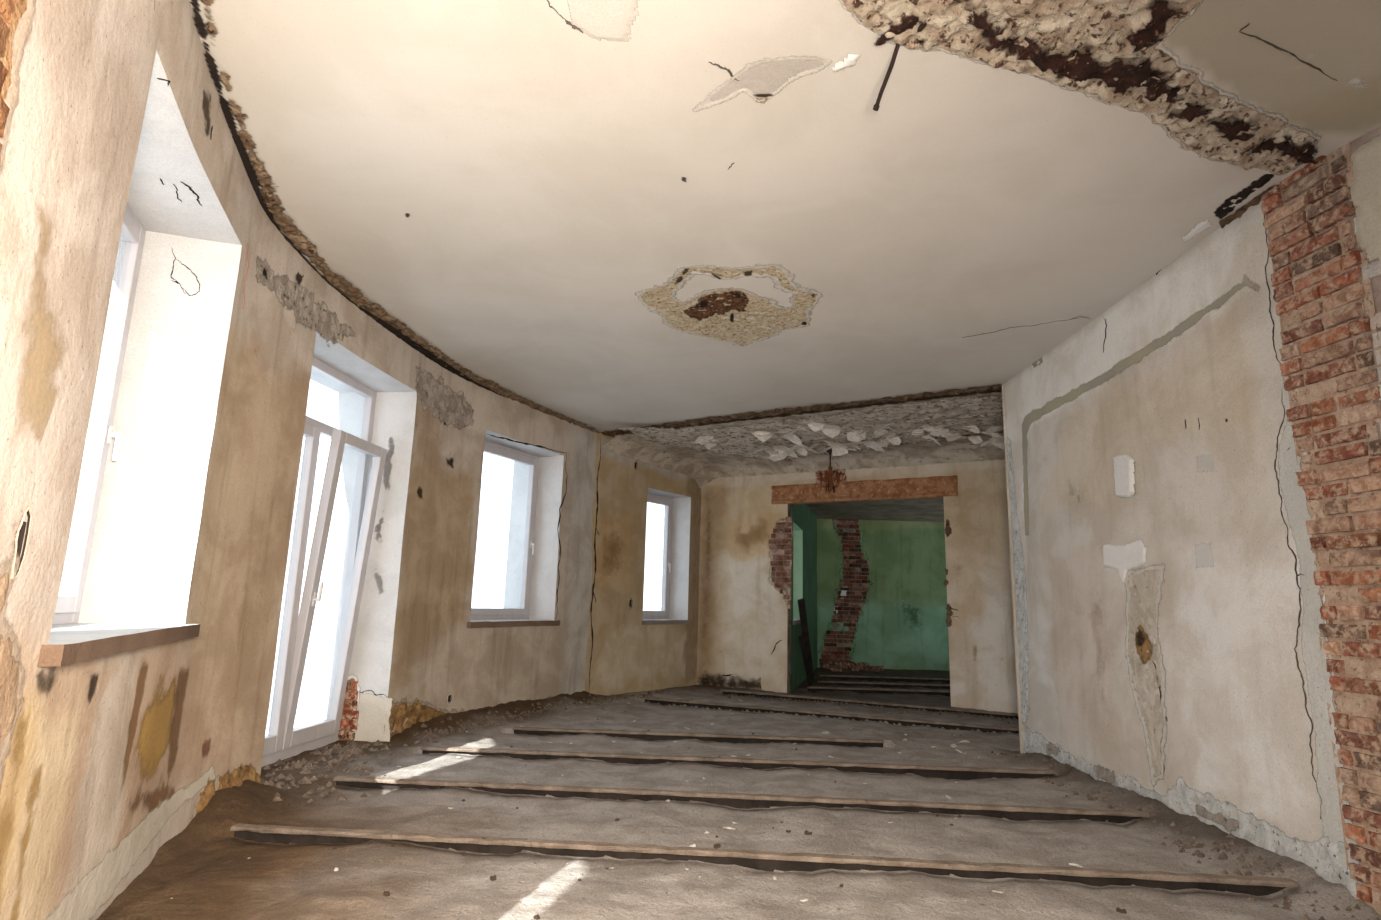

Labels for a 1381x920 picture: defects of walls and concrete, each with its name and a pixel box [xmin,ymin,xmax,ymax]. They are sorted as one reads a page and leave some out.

flaking render [0,0,36,171]
peeling [693,54,860,112]
crack [1239,23,1337,81]
flaking render [21,215,61,438]
flaking render [256,256,355,347]
flaking render [416,366,474,429]
crack [962,316,1107,352]
flaking render [614,149,1381,915]
crack [1263,214,1322,819]
flaking render [0,560,26,793]
leakage [123,664,188,812]